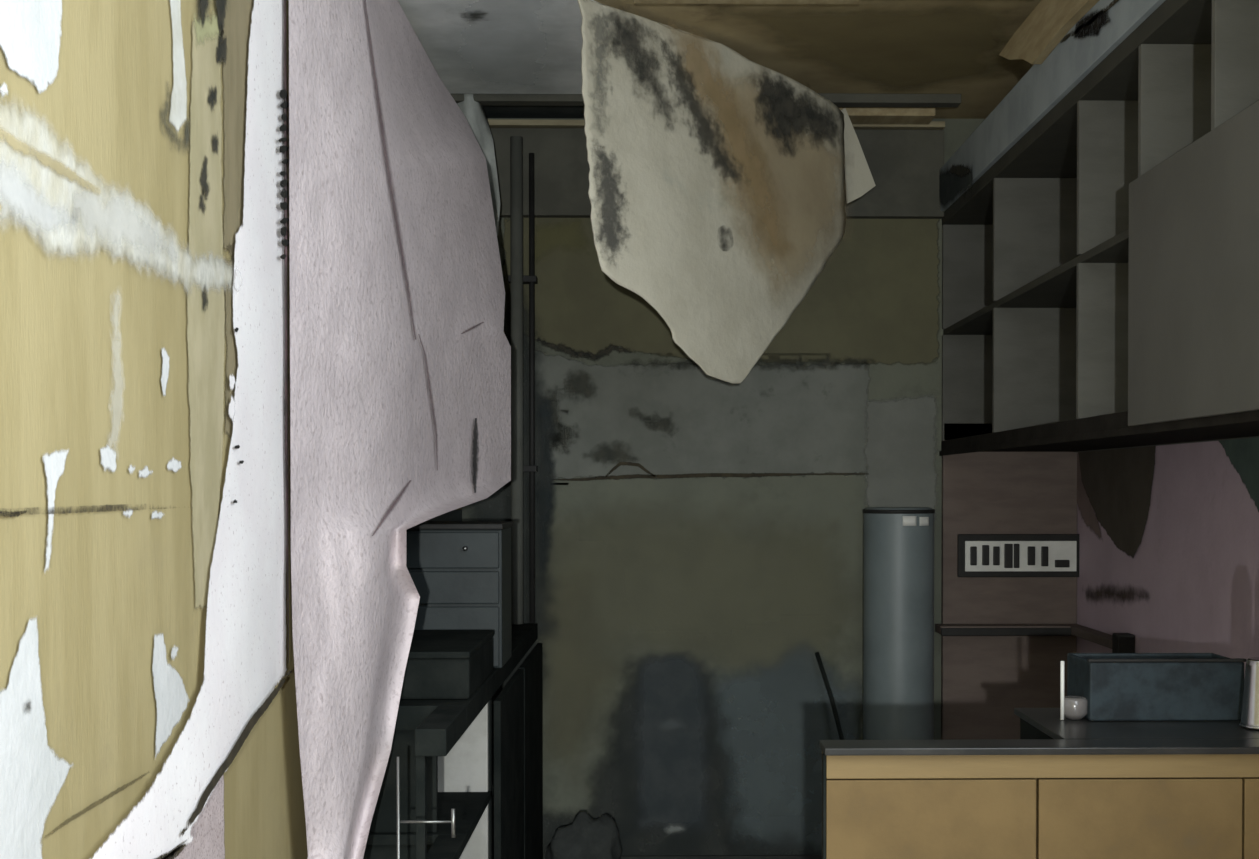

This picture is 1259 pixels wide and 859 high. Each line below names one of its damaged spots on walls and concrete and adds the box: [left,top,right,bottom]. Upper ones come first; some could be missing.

peeling [0,0,62,93]
damp [200,0,227,64]
damp [200,137,219,212]
damp [208,87,217,109]
damp [482,13,841,274]
peeling [234,269,242,291]
crack [0,505,165,517]
peeling [0,618,72,859]
peeling [152,634,189,756]
damp [591,652,863,856]